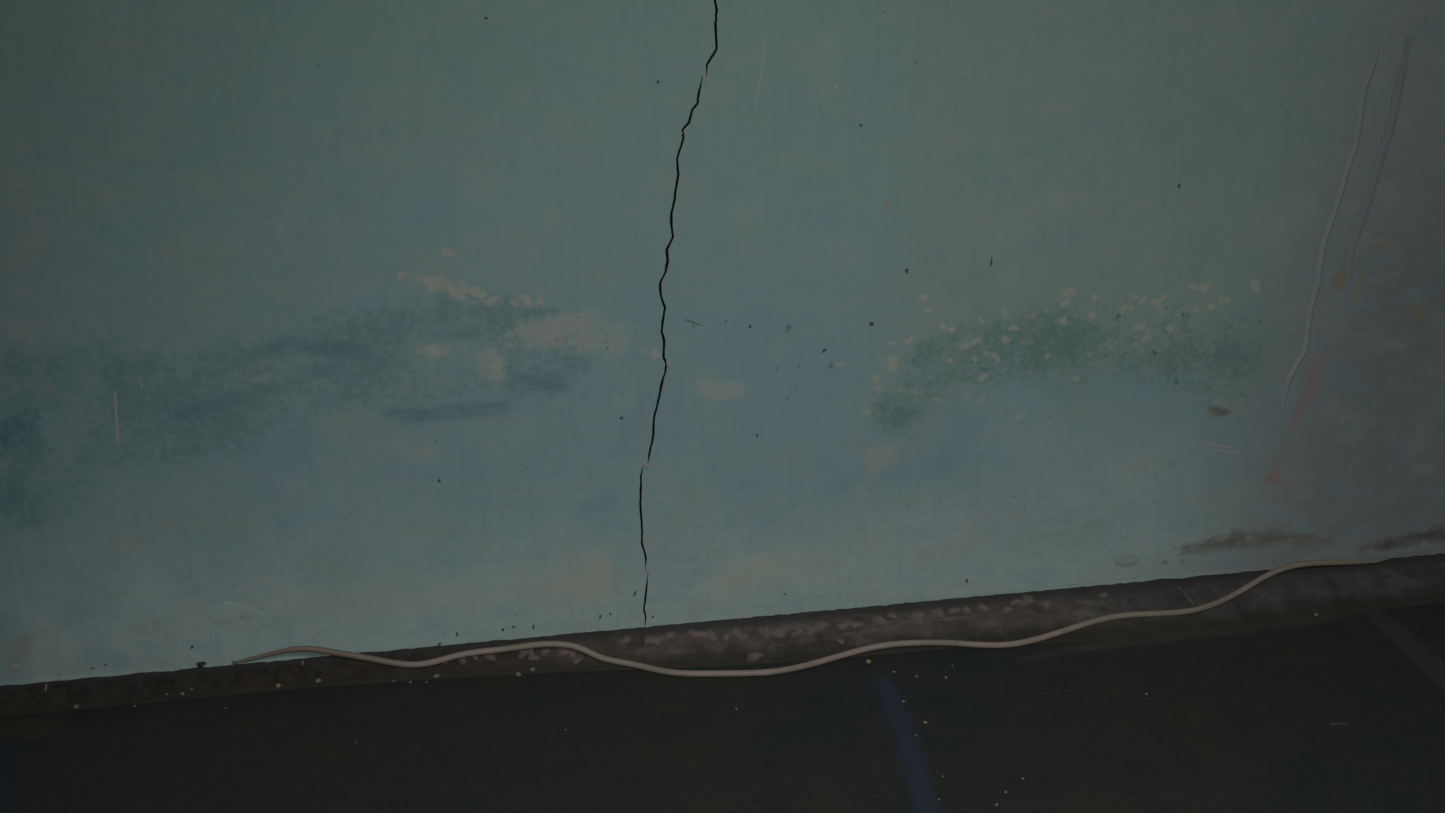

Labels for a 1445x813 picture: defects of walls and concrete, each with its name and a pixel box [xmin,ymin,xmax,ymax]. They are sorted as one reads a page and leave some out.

crack [639,0,718,650]
leakage [879,307,1262,425]